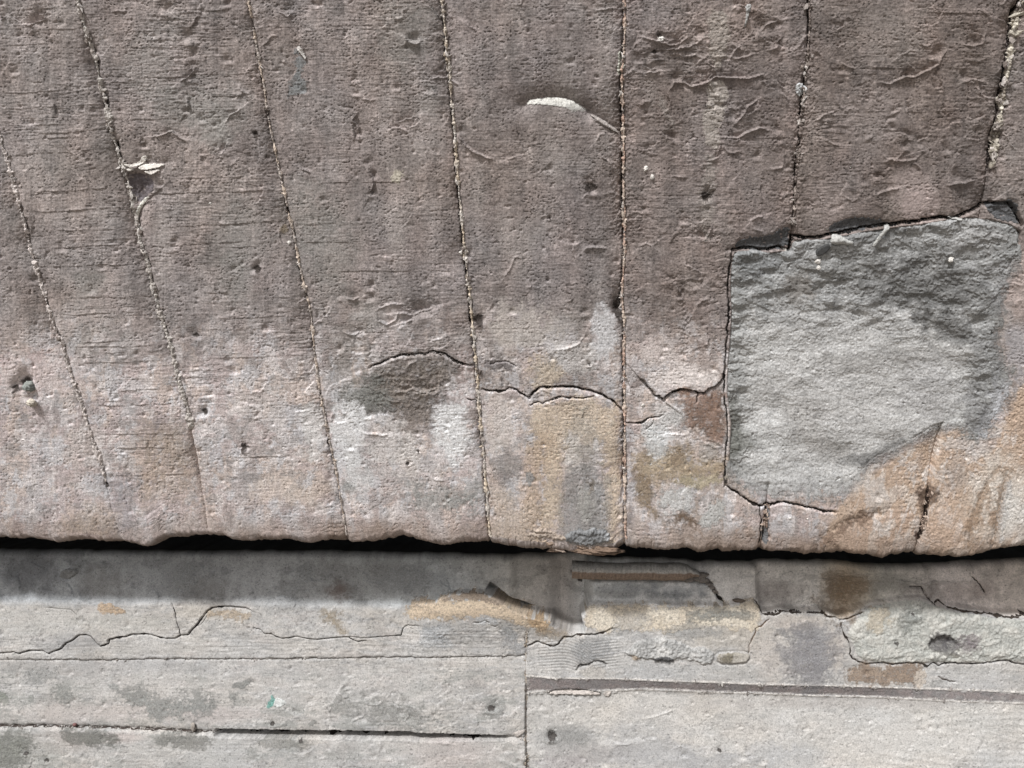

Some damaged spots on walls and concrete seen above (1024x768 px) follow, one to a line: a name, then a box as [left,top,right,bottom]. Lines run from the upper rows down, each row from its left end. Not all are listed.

peeling [527,97,619,133]
peeling [119,153,164,175]
spalling [735,227,790,250]
spalling [829,217,890,247]
spalling [984,199,1019,224]
crack [370,201,1020,542]
crack [4,604,417,654]
spalling [406,588,551,634]
crack [748,599,1020,682]
crack [910,577,1024,619]